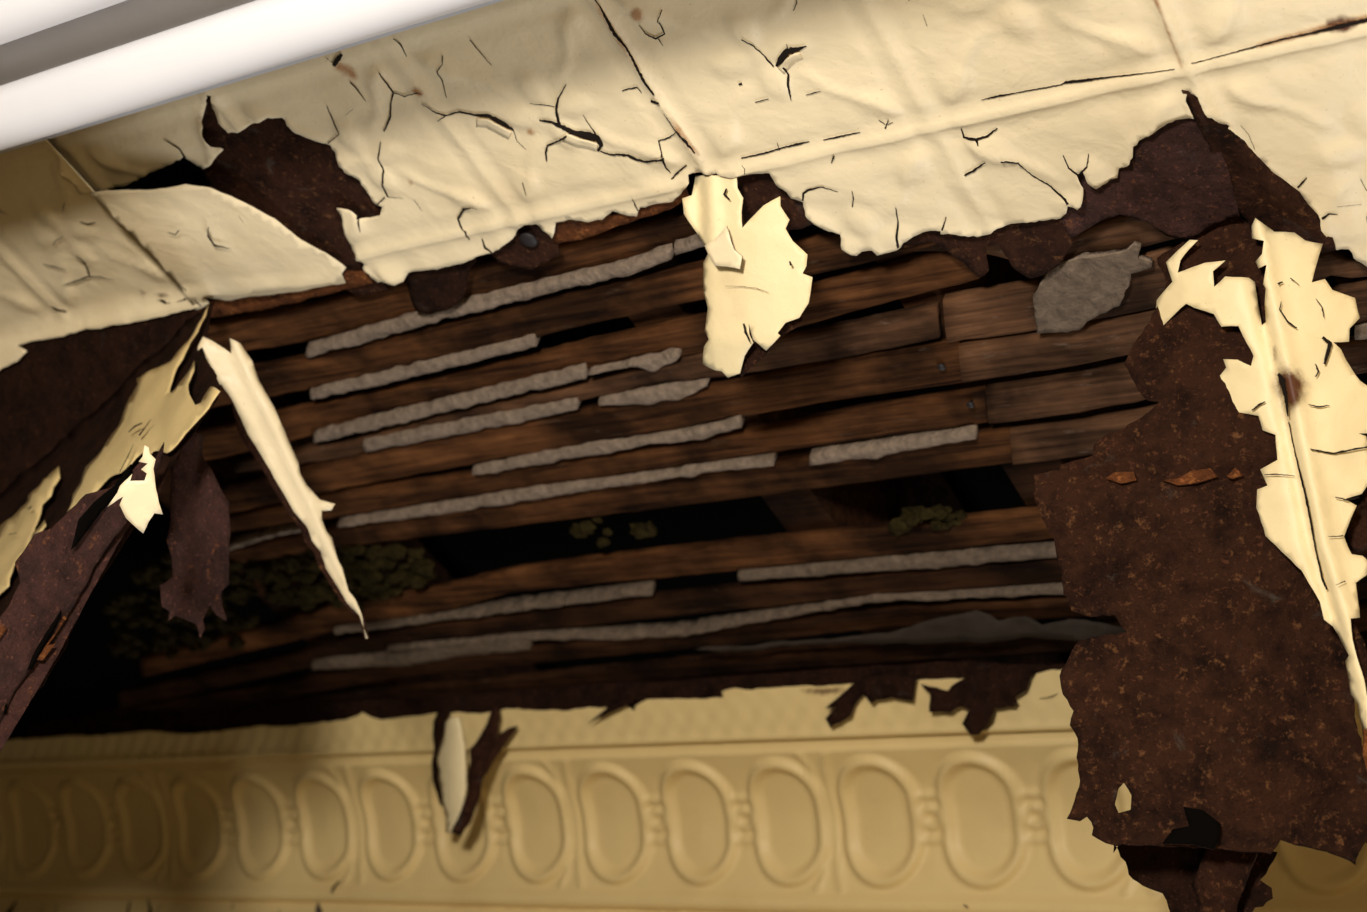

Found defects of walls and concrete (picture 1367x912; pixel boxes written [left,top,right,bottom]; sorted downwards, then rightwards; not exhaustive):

crack [739,39,821,103]
peeling [476,118,512,140]
crack [325,0,695,232]
peeling [562,134,598,152]
crack [723,120,893,207]
crack [961,18,1367,205]
crack [457,208,492,253]
peeling [704,226,743,269]
crack [893,208,901,248]
corrosion [1278,370,1303,408]
peeling [108,445,163,533]